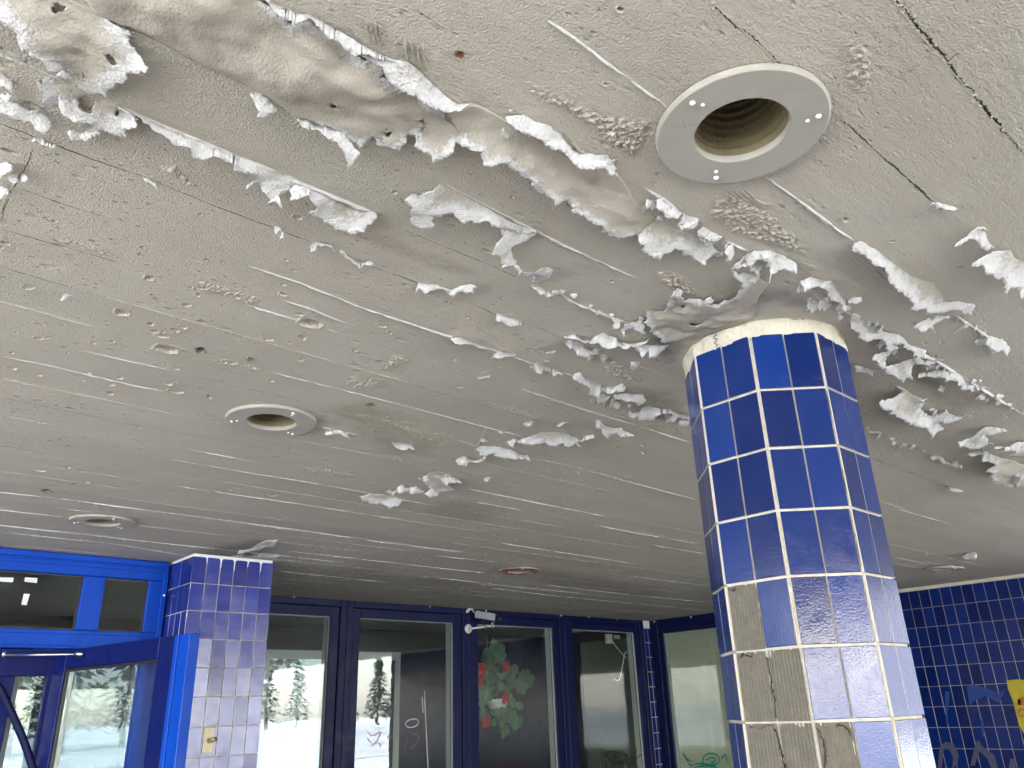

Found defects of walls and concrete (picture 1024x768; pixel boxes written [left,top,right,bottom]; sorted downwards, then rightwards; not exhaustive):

crack [709,0,781,64]
crack [894,0,1024,154]
crack [832,112,959,228]
peeling [0,0,1024,509]
peeling [231,540,280,558]
crack [740,653,786,768]
crack [817,724,851,768]